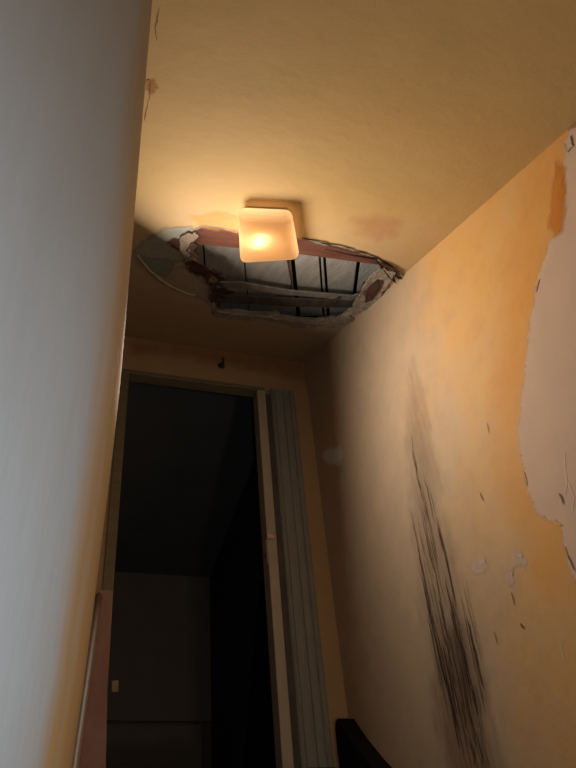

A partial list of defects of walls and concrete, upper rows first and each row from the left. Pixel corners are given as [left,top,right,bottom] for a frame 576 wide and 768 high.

flaking render [133,225,402,329]
peeling [516,122,576,581]
water stain [411,437,490,768]